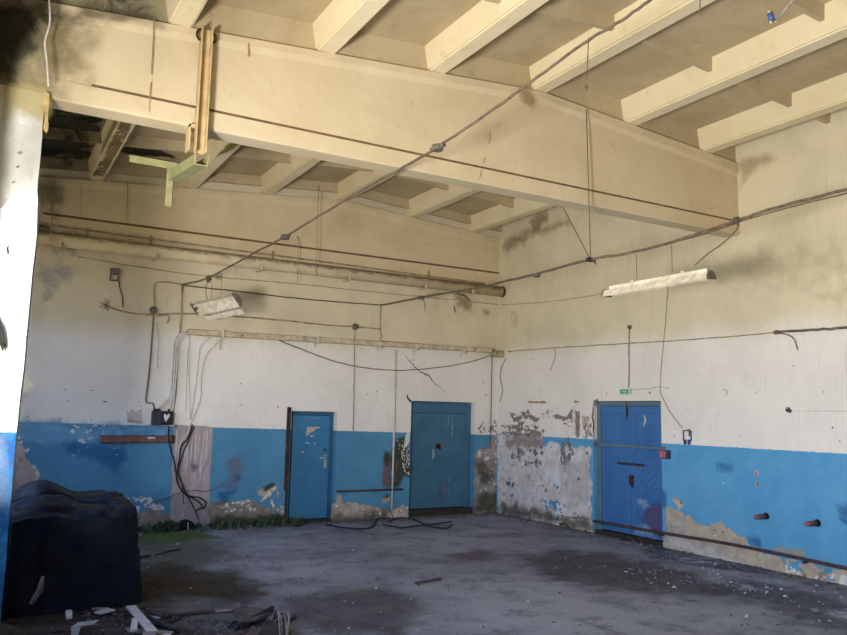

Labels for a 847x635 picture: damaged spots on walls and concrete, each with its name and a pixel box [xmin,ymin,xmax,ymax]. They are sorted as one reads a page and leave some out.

leakage [0,4,102,159]
peeling [13,437,40,492]
peeling [473,407,594,533]
peeling [128,496,172,529]
spalling [207,483,284,527]
spalling [330,494,408,521]
peeling [628,497,847,607]